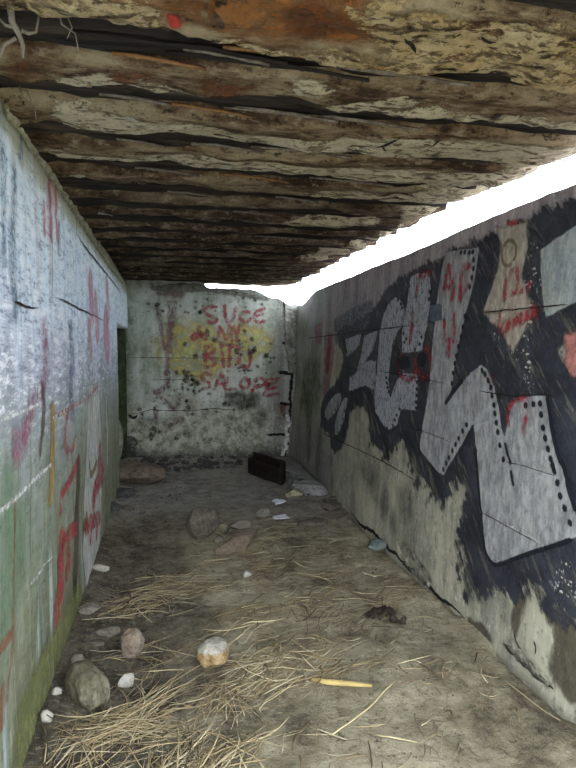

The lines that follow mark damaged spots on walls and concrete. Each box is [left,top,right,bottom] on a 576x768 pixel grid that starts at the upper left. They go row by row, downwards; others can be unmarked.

peeling [0,0,166,30]
rust [115,0,376,43]
peeling [212,0,576,94]
rust [434,25,509,60]
peeling [44,72,210,97]
peeling [292,79,576,130]
peeling [5,98,576,284]
crack [59,298,102,320]
crack [351,512,466,619]